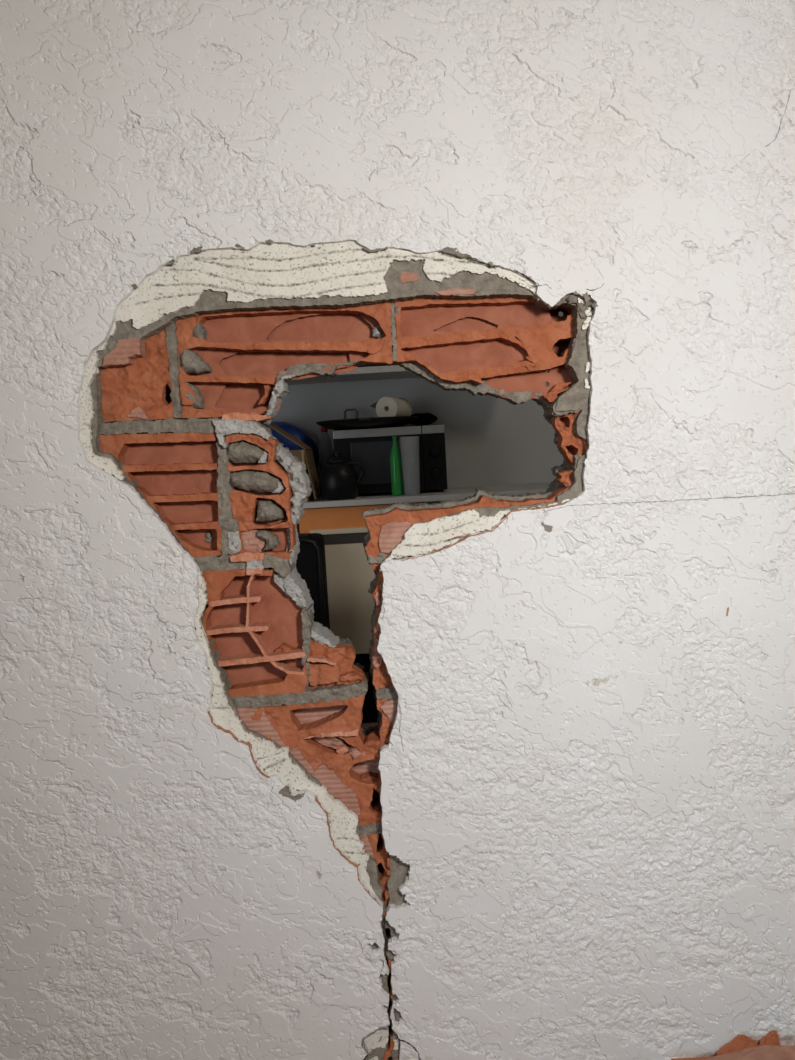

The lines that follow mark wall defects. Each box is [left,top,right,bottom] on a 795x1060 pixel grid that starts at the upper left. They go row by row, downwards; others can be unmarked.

spalling [79,239,598,1060]